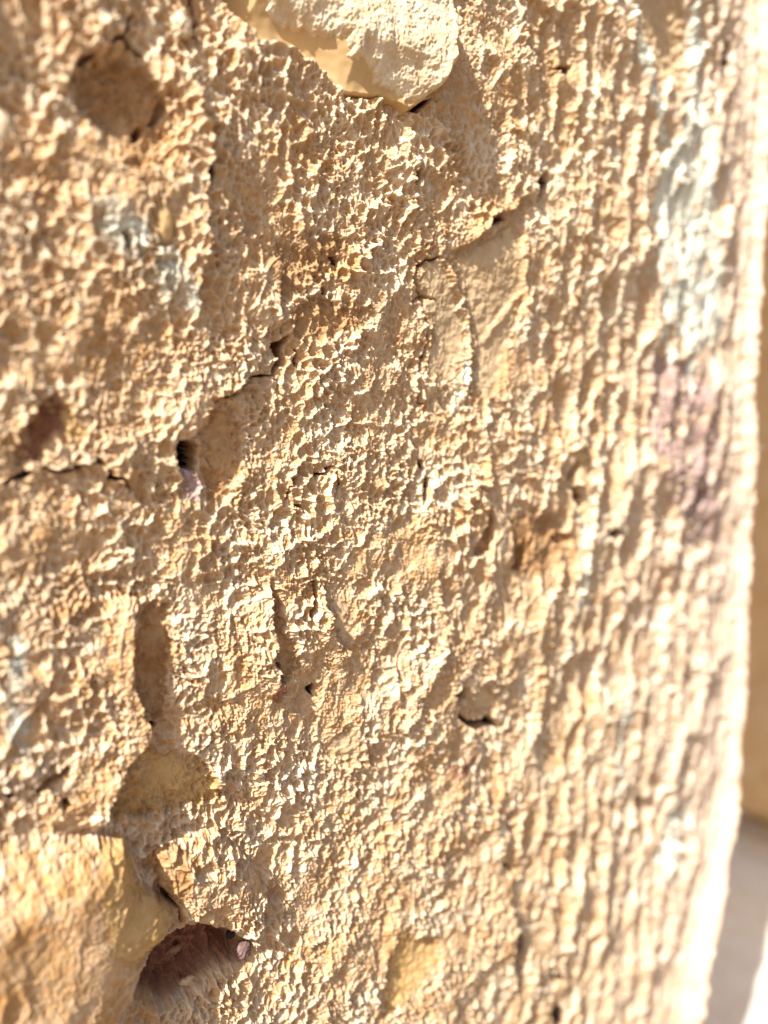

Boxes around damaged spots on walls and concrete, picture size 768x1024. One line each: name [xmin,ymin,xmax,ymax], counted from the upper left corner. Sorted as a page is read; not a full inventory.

crack [3,457,127,486]
spalling [139,923,235,989]